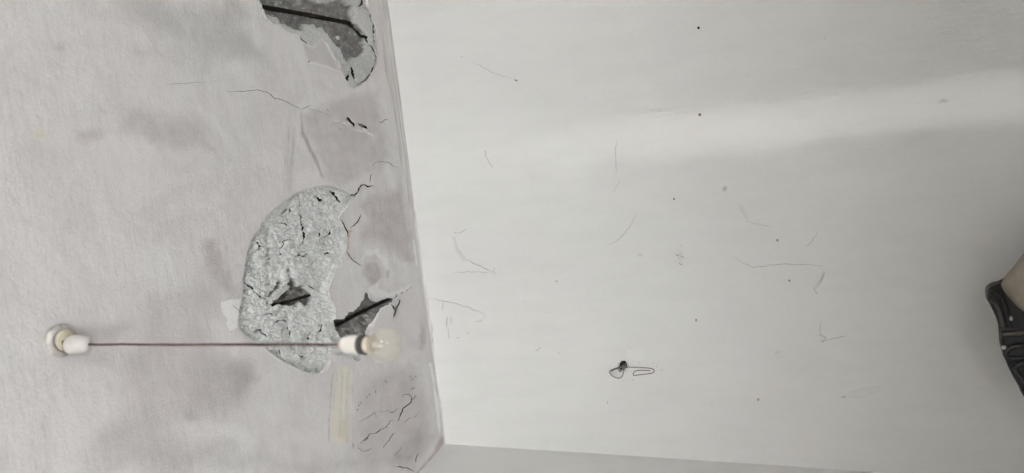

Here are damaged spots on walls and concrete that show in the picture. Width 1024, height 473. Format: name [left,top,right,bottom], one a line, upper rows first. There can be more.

spalling [259,0,379,88]
crack [229,89,345,129]
crack [341,161,395,266]
spalling [238,185,395,375]
crack [353,394,419,472]